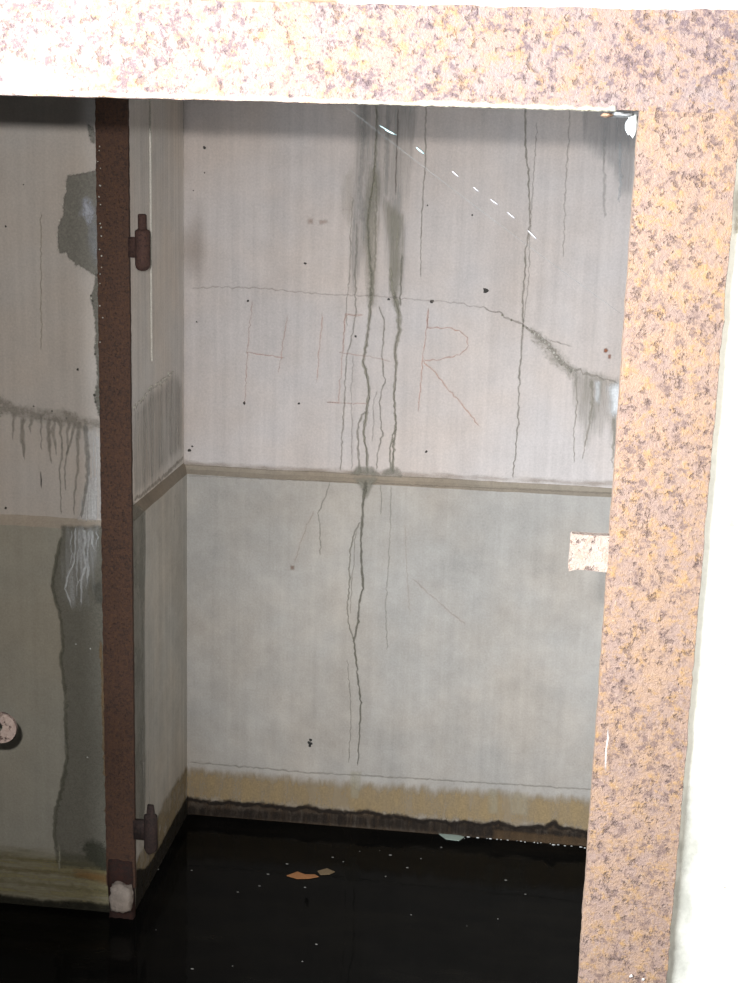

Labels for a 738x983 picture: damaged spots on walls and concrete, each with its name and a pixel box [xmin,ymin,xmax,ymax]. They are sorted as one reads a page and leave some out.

peeling [56,125,103,415]
crack [347,105,402,764]
water stain [585,376,619,427]
water stain [0,400,110,912]
water stain [136,768,590,909]